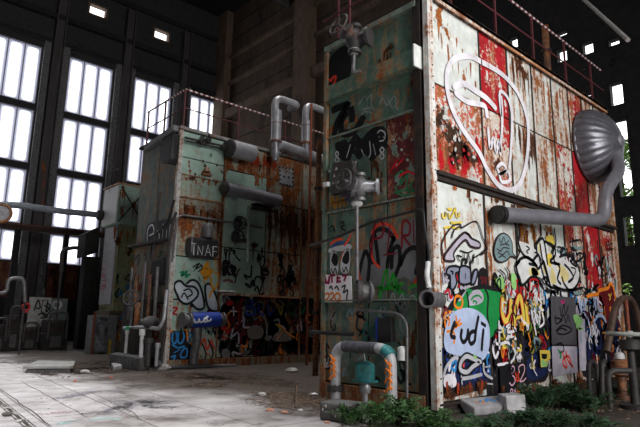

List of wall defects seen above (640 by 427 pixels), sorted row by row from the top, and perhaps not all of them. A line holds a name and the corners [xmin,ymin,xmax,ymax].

corrosion [511,56,569,121]
peeling [435,104,481,177]
peeling [559,149,575,188]
corrosion [183,203,220,234]
corrosion [235,158,313,265]